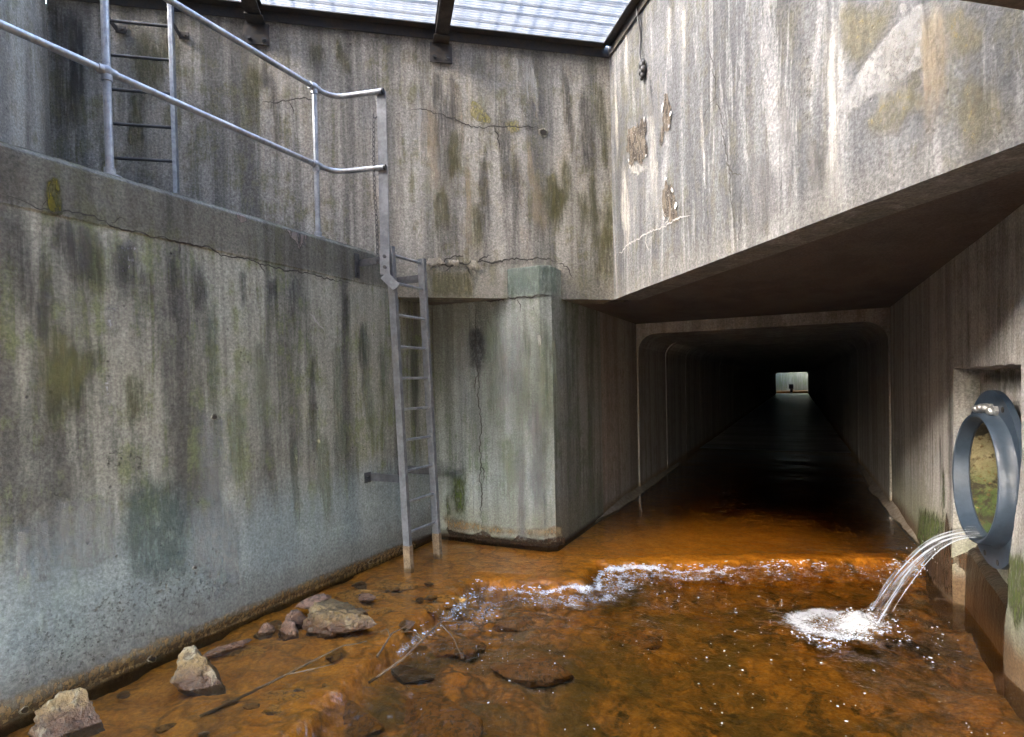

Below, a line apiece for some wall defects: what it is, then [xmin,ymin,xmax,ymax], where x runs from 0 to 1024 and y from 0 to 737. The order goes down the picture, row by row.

crack [412,108,539,147]
water stain [500,111,519,215]
water stain [564,81,589,160]
spalling [626,117,647,170]
spalling [659,93,672,146]
spalling [662,177,680,222]
crack [2,193,348,283]
crack [619,215,691,253]
crack [441,255,572,277]
crack [474,294,549,530]